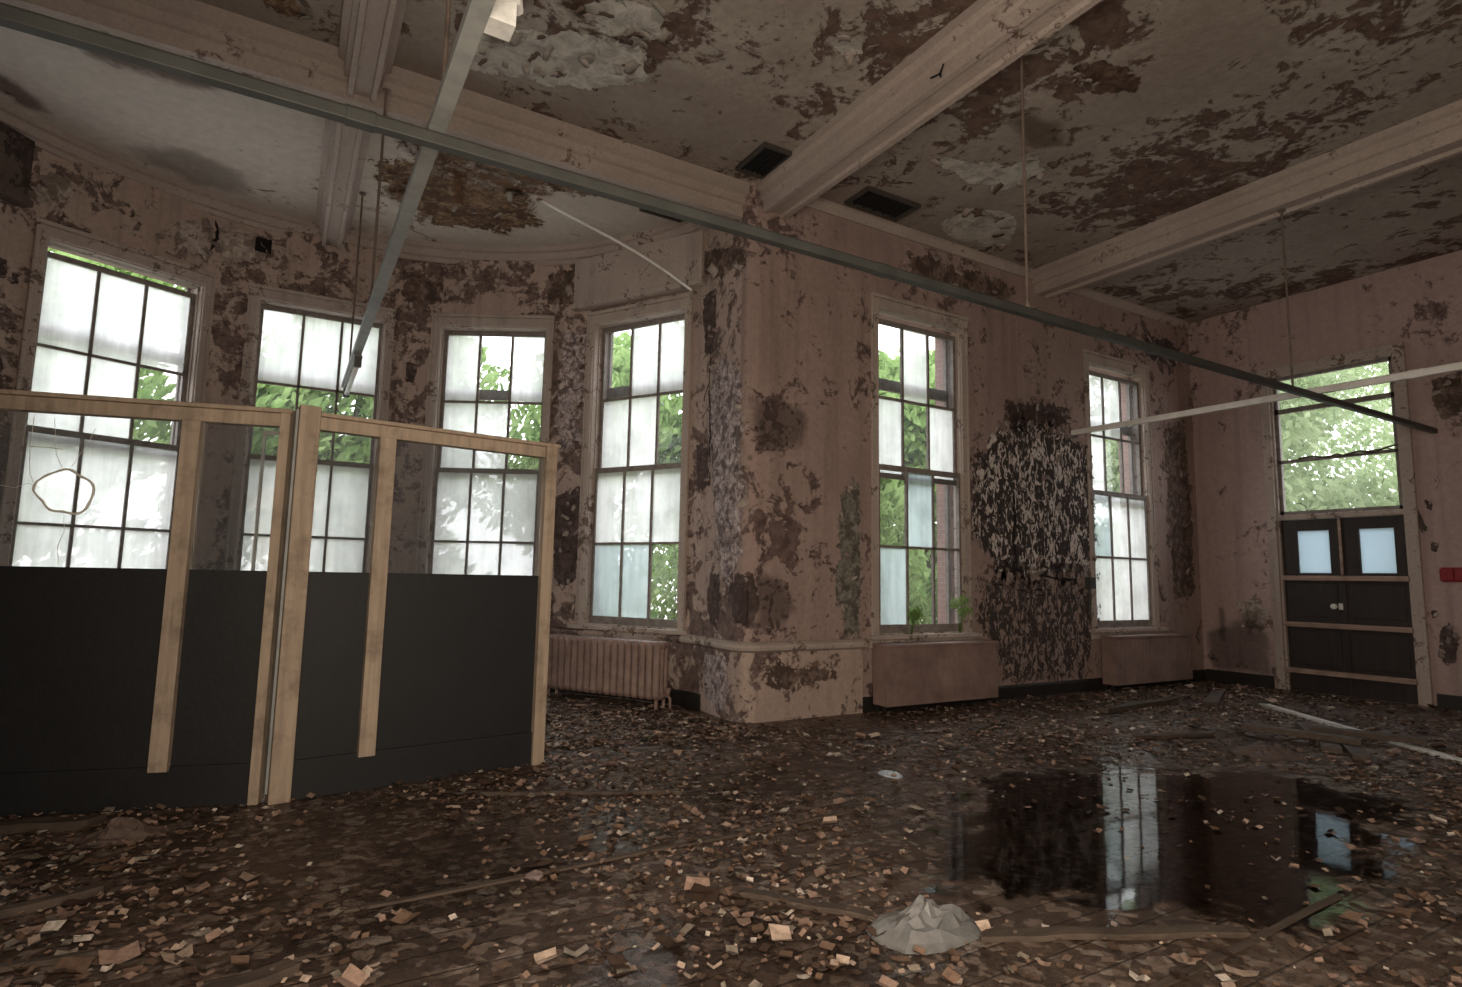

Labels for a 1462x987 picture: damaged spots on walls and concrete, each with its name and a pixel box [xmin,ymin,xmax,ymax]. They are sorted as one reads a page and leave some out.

peeling [262,0,316,25]
peeling [470,0,675,94]
peeling [1071,60,1141,96]
flaking render [255,236,272,254]
peeling [906,154,1057,309]
flaking render [0,257,22,284]
peeling [401,271,450,307]
peeling [516,265,575,314]
peeling [404,359,421,385]
peeling [550,325,587,453]
flaking render [701,652,728,713]
peeling [754,658,840,698]